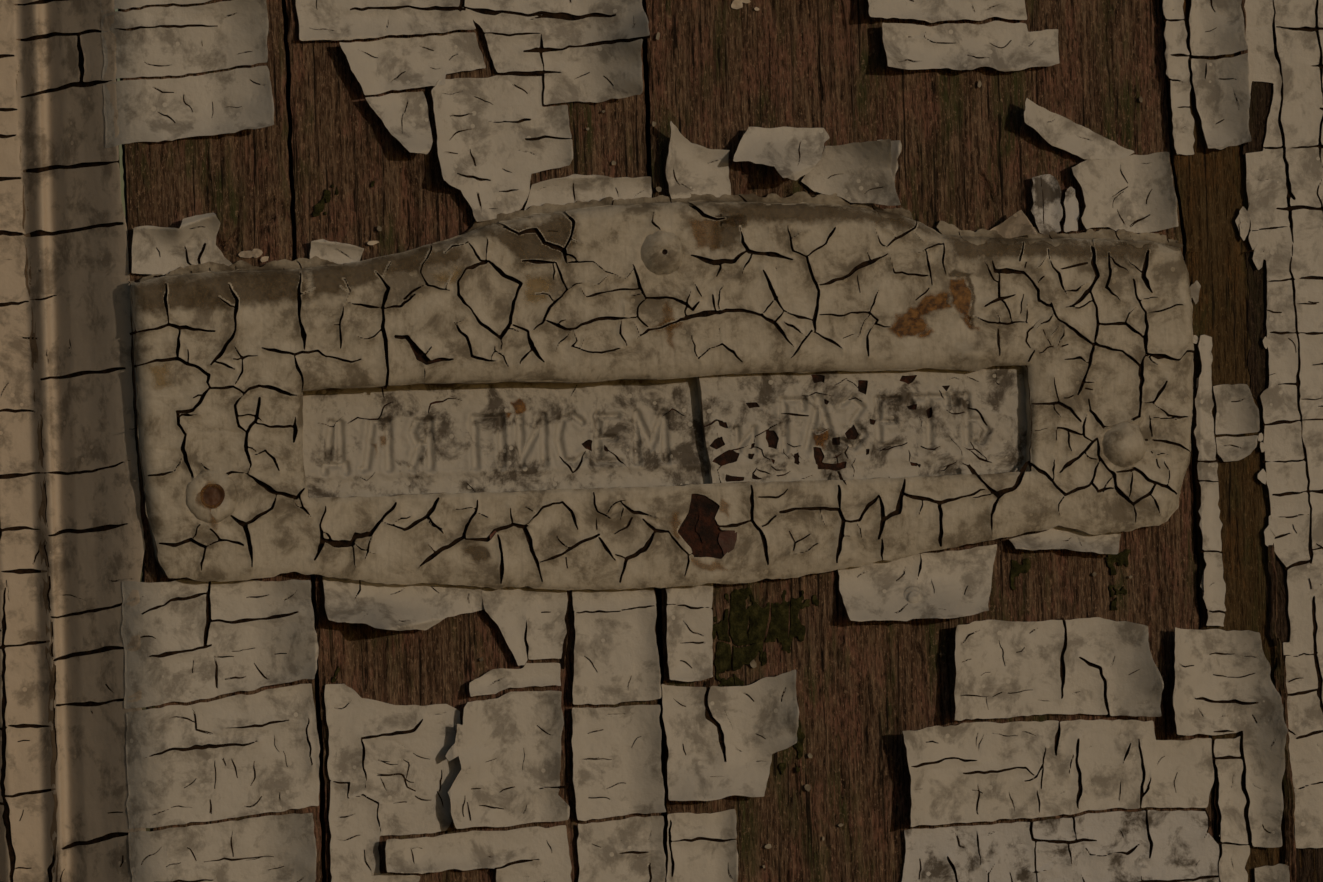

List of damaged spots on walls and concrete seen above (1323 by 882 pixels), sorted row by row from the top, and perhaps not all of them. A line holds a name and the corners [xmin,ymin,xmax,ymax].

peeling [100,0,274,148]
peeling [295,0,902,222]
peeling [867,0,1060,72]
peeling [990,0,1273,238]
peeling [131,213,232,275]
corrosion [890,278,978,337]
crack [0,0,945,882]
crack [720,0,1323,882]
peeling [121,576,799,882]